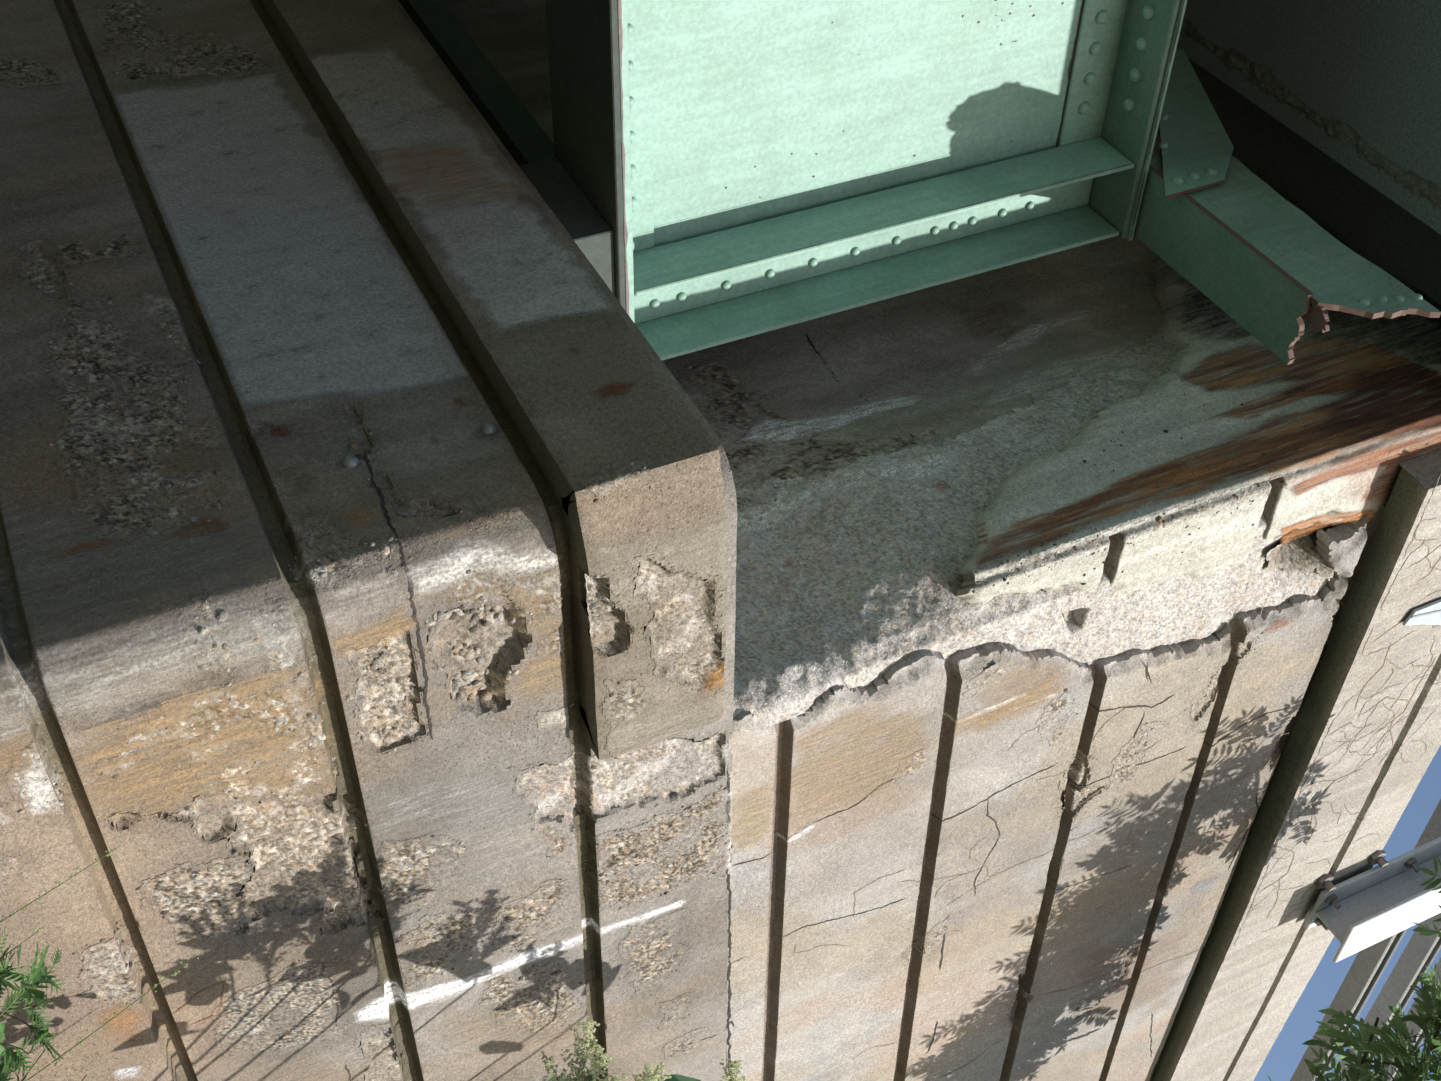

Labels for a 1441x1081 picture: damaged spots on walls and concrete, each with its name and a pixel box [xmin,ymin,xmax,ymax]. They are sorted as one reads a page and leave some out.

spalling [142,291,205,374]
corrosion [978,340,1441,564]
crack [363,450,433,740]
spalling [72,329,1350,1008]
crack [784,475,1441,995]
peeling [211,960,410,1081]
peeling [479,958,582,1036]